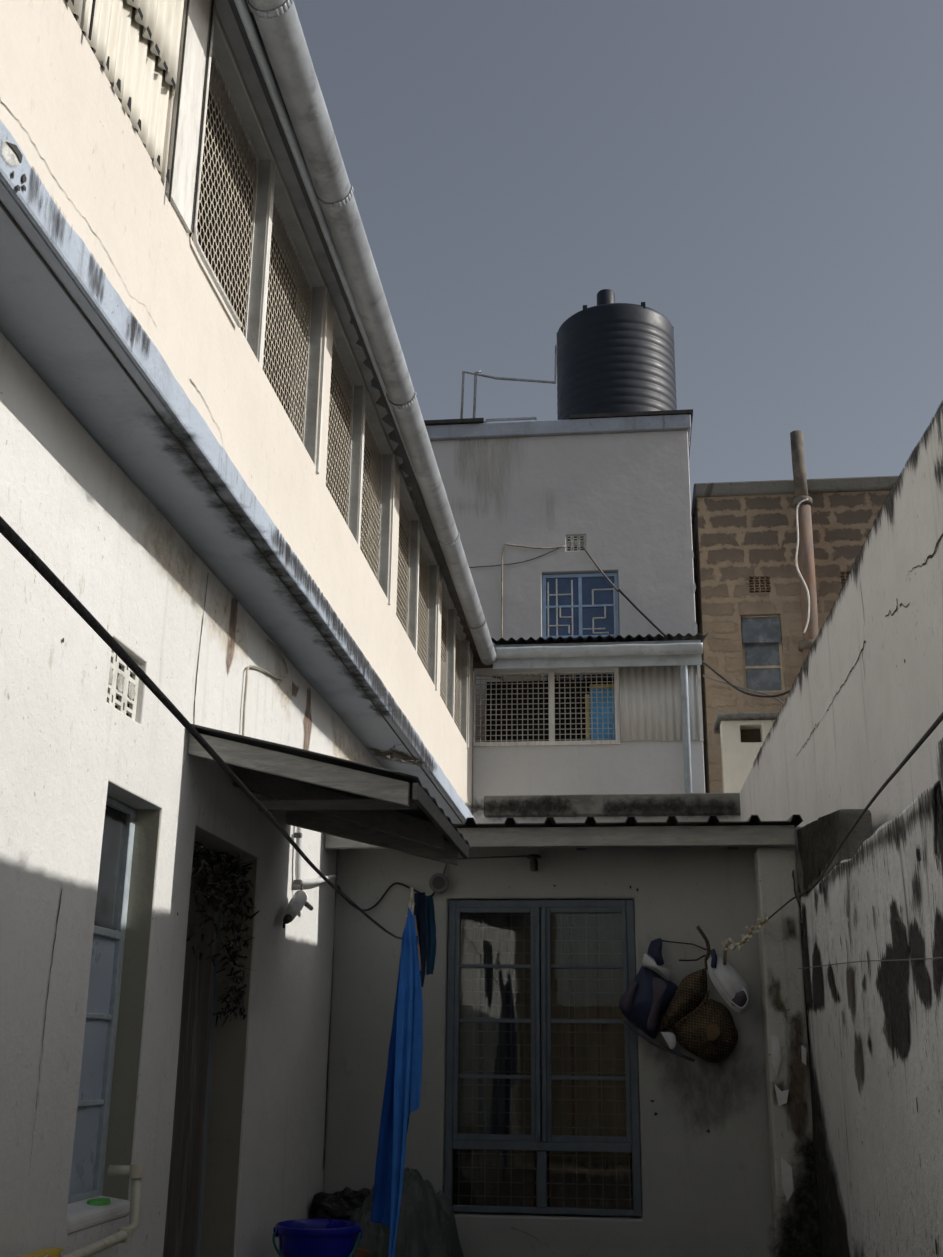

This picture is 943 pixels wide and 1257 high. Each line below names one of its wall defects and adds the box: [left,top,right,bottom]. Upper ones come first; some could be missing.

water stain [30,167,65,239]
crack [0,99,157,327]
water stain [90,254,104,301]
water stain [127,315,150,354]
crack [796,533,943,757]
water stain [797,738,943,928]